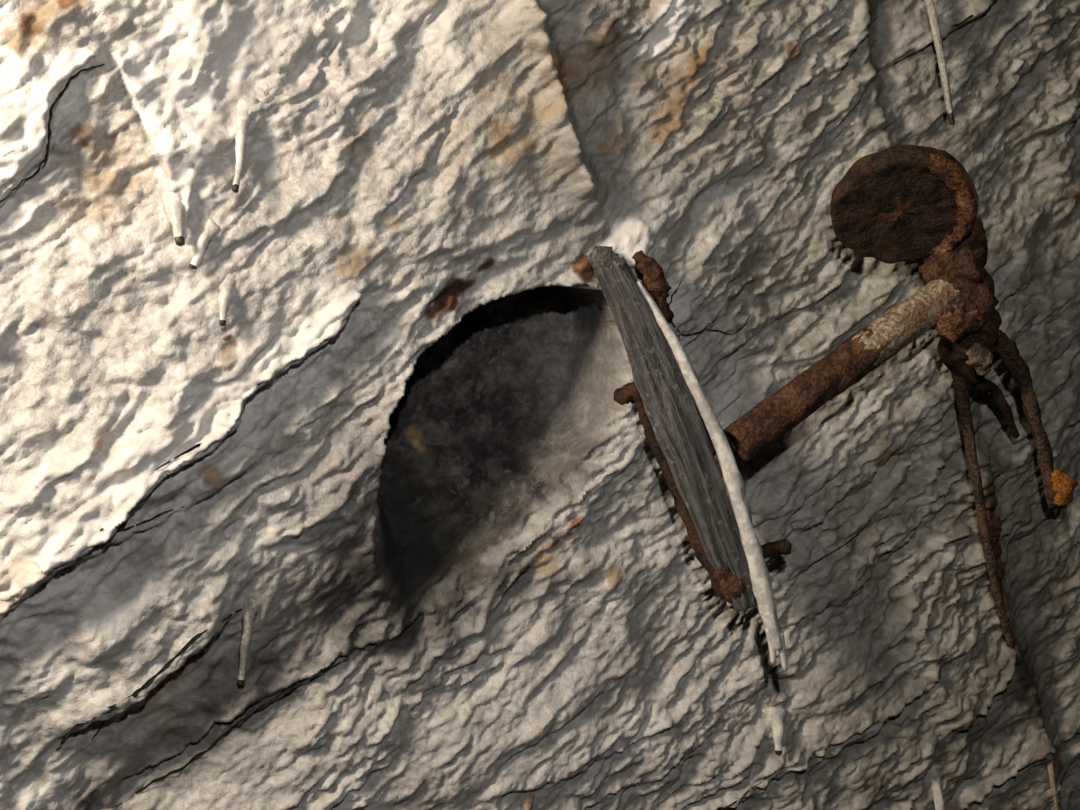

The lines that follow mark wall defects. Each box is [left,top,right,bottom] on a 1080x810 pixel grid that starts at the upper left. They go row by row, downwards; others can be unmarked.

rust [6,0,77,51]
crack [889,0,998,68]
crack [0,64,105,203]
rust [928,154,979,258]
rust [426,257,494,316]
crack [155,443,201,471]
spalling [374,285,634,622]
crack [100,506,184,532]
rust [983,478,1011,610]
crack [55,608,243,751]
crack [116,658,350,807]